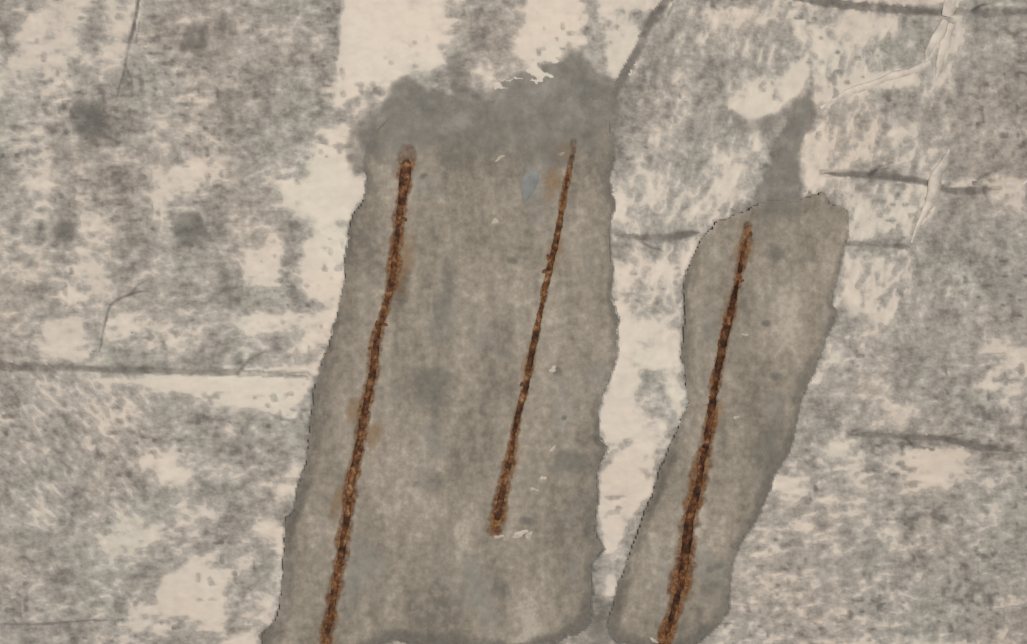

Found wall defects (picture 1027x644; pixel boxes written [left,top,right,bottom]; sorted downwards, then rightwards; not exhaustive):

crack [899,7,942,15]
crack [614,46,640,95]
peeling [76,66,235,244]
rust [557,139,576,221]
crack [828,170,859,178]
crack [884,175,928,184]
rust [320,145,415,644]
peeling [69,483,221,571]
peeling [115,443,255,490]
rust [489,356,533,535]
rust [658,359,725,644]
peeling [810,419,1027,560]